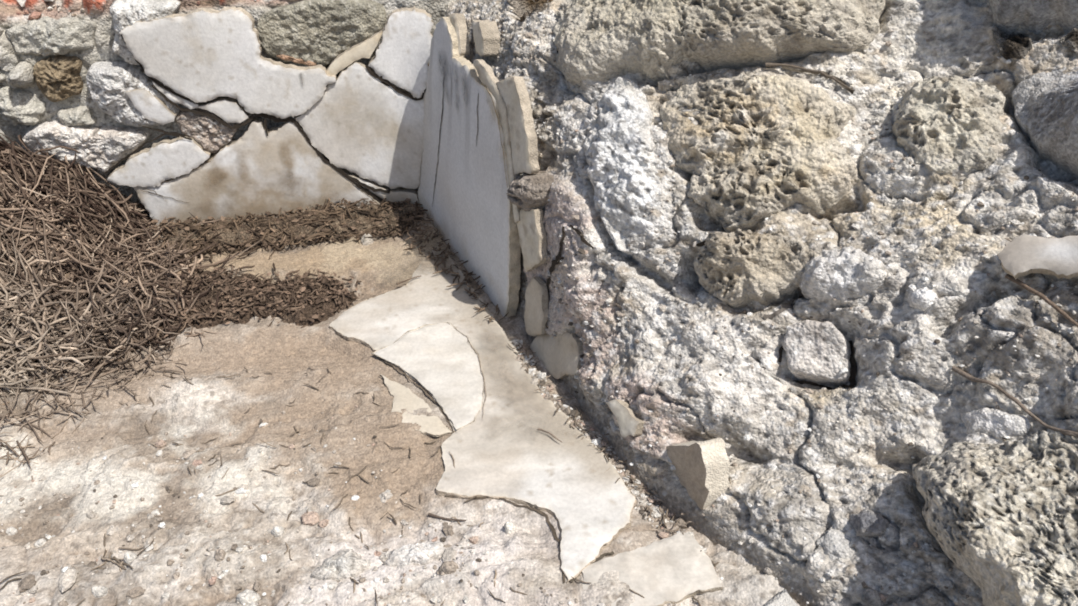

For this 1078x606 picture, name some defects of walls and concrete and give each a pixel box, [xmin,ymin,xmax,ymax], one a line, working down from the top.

crack [104,35,390,205]
crack [365,65,508,205]